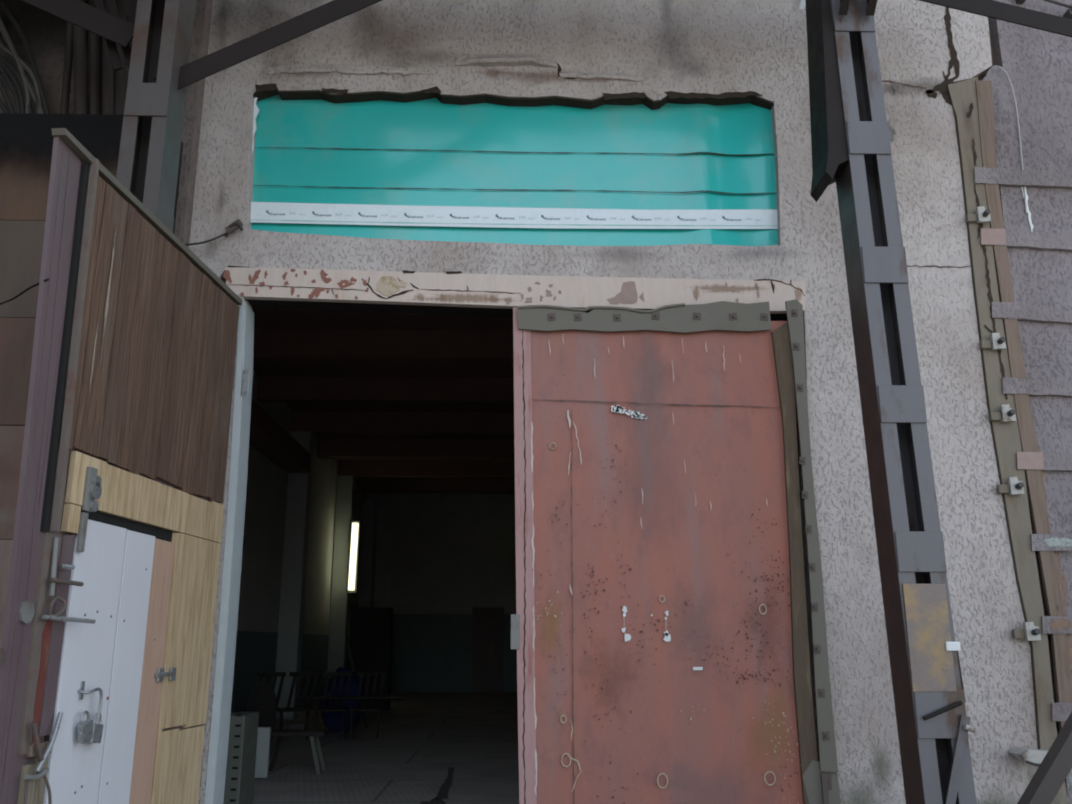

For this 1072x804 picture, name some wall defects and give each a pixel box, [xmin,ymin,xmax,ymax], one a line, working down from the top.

crack [882,7,960,95]
crack [907,103,1008,400]
peeling [240,269,369,300]
peeling [521,282,561,303]
peeling [607,281,644,305]